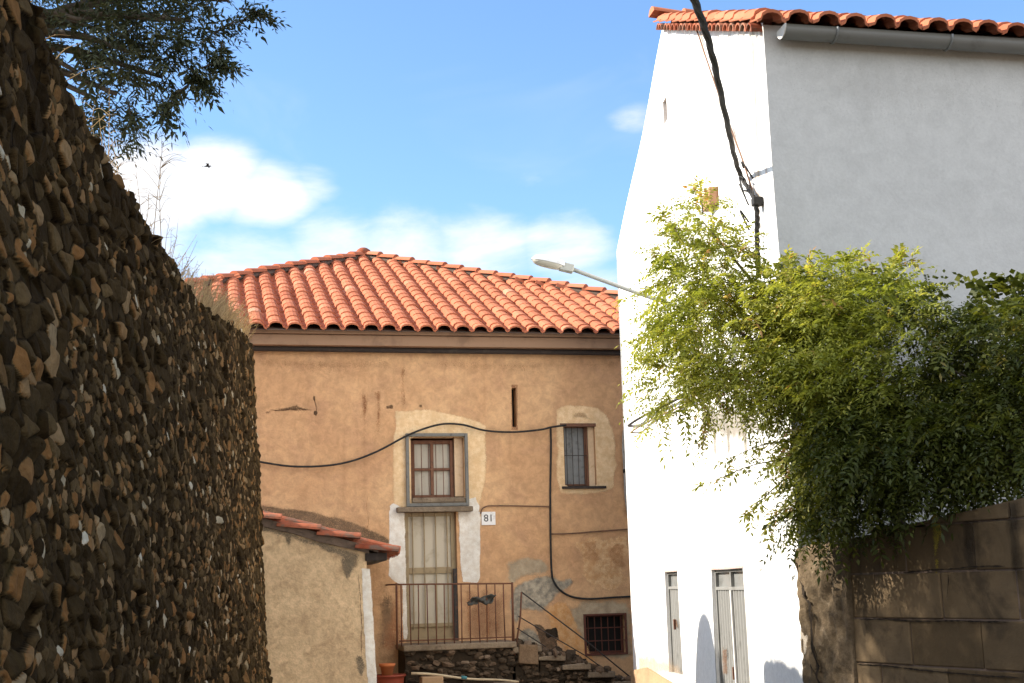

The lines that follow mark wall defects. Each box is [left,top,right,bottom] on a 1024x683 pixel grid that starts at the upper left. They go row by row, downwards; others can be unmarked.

water stain [263,526,361,580]
crack [799,580,820,683]